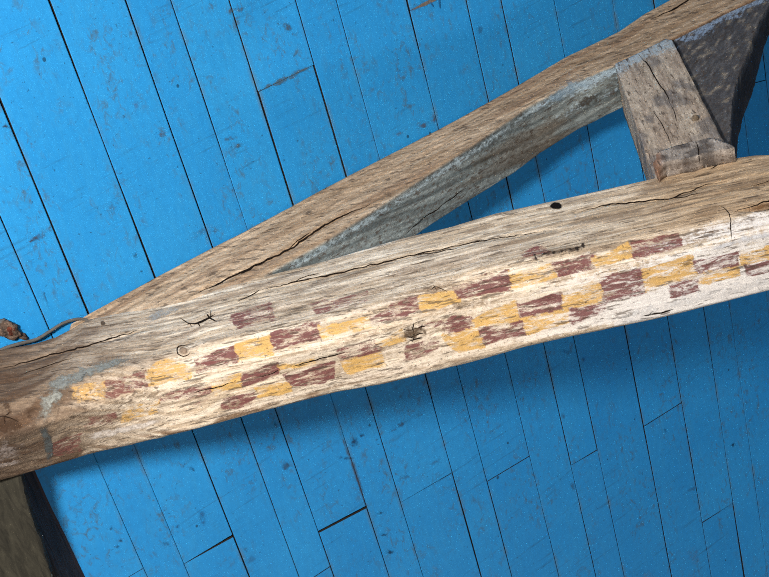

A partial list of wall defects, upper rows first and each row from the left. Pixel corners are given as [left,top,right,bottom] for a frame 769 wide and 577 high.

crack [407,188,466,233]
crack [194,204,370,295]
crack [239,230,550,301]
crack [182,312,217,326]
crack [4,331,134,376]